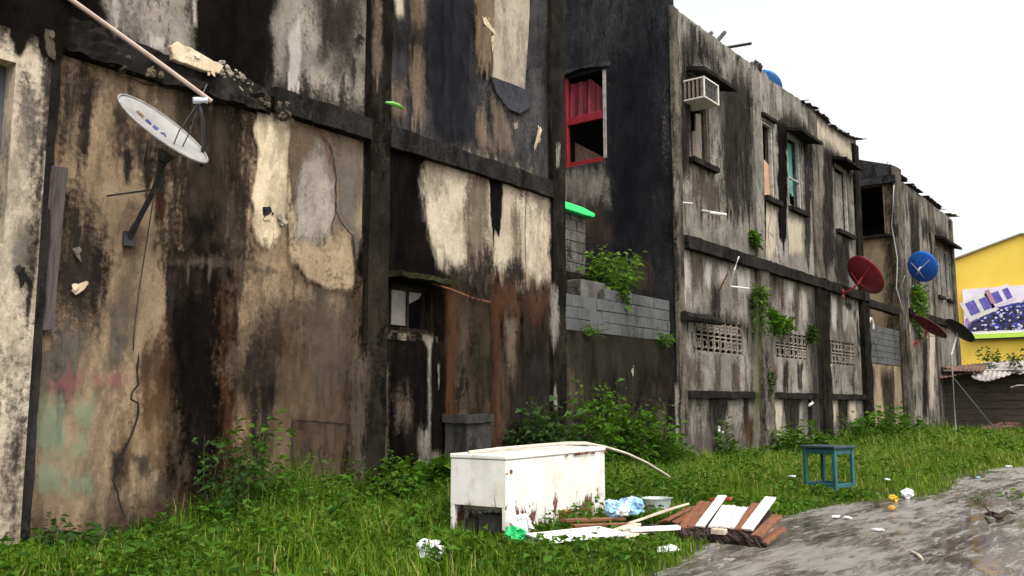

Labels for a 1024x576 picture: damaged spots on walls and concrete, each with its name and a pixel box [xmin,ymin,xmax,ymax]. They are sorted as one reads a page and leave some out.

flaking render [15,265,28,288]
peeling [44,28,56,61]
crack [111,352,143,517]
damp [81,78,370,538]
peeling [167,42,336,249]
crack [321,135,357,287]
damp [192,0,515,156]
corrosion [446,290,460,415]
damp [385,149,586,474]
peeling [482,16,495,53]
corrosion [491,272,525,448]
damp [547,15,856,437]